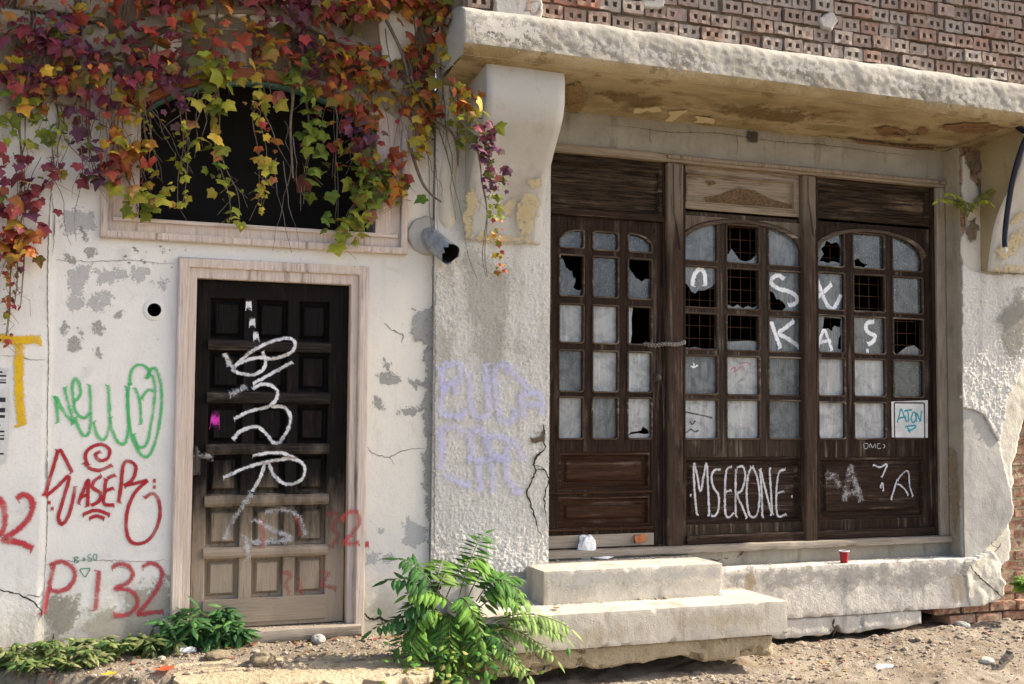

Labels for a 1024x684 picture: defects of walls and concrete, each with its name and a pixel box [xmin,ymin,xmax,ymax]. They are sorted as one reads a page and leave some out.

peeling [632,106,715,124]
flaking render [964,151,982,196]
peeling [462,175,542,244]
flaking render [966,217,980,242]
peeling [60,207,168,359]
crack [0,95,172,624]
crack [367,447,424,464]
flaking render [372,306,433,550]
crack [526,424,550,537]
peeling [366,551,394,564]